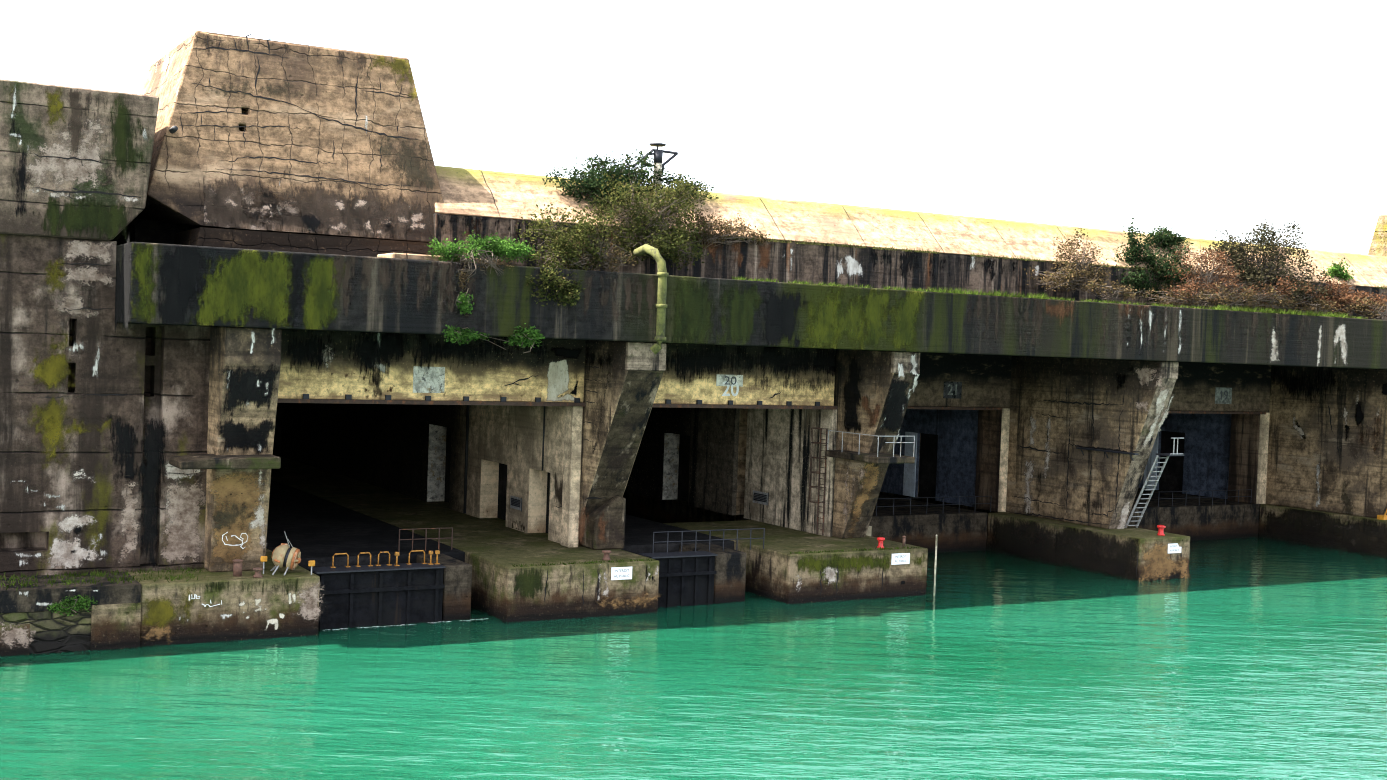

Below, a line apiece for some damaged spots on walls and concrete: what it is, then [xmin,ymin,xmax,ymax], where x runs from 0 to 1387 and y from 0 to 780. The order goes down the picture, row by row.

leakage [68,88,99,154]
crack [179,33,418,186]
peeling [204,188,425,237]
leakage [438,214,531,240]
leakage [159,245,209,325]
leakage [250,252,305,353]
leakage [332,255,477,319]
leakage [837,251,1044,348]
leakage [1100,307,1186,352]
spalling [880,378,910,432]
peeling [48,482,141,568]
peeling [159,462,206,564]